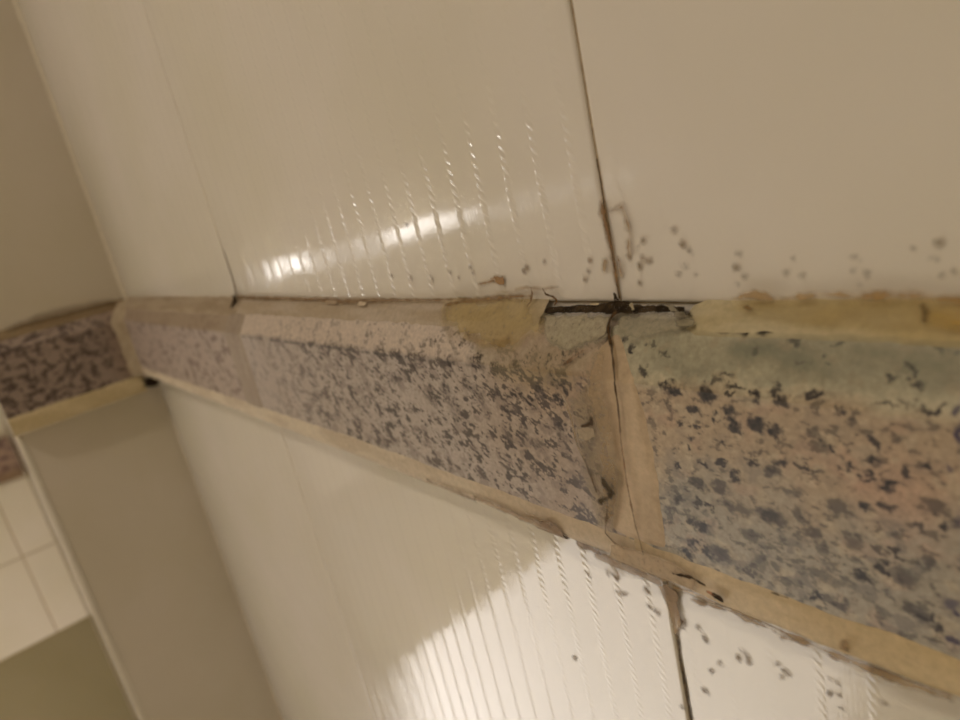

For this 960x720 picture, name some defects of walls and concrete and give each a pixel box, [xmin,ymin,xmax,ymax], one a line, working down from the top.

crack [596,159,612,252]
damp [445,294,538,346]
peeling [565,354,623,548]
crack [527,283,691,549]
spalling [545,303,694,365]
damp [445,487,950,699]